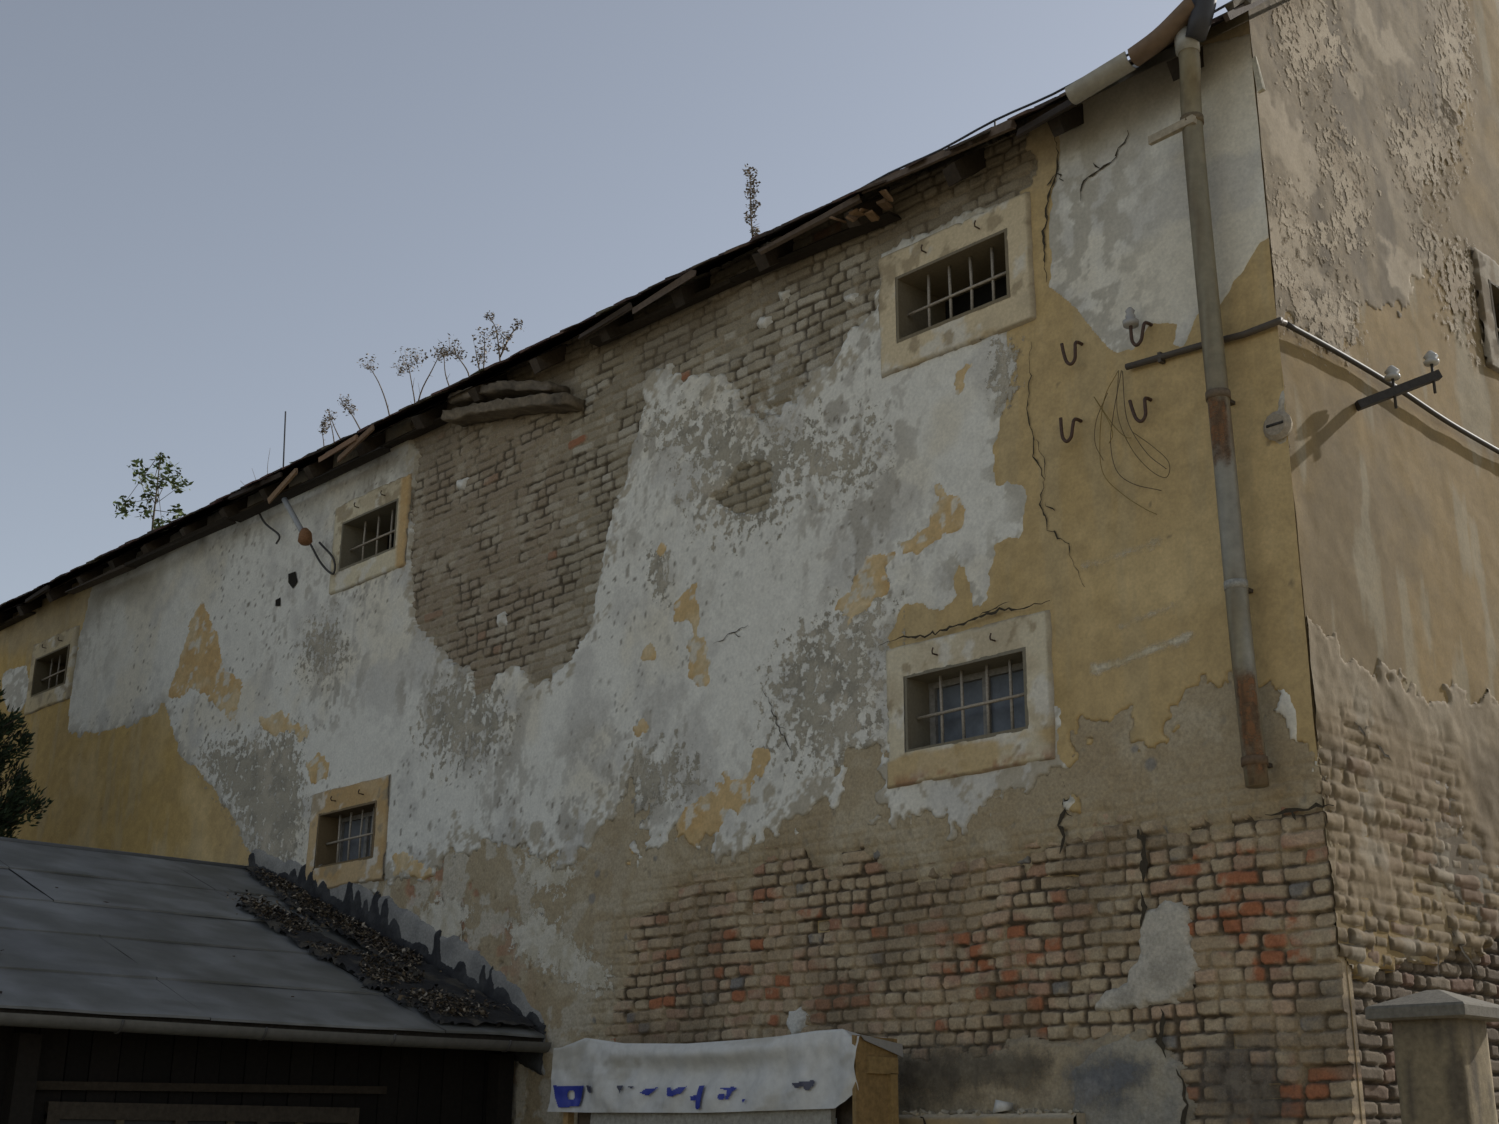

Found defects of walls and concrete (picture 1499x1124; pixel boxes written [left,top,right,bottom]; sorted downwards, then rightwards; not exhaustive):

peeling [1049,47,1199,353]
flaking render [1200,0,1485,374]
crack [1026,344,1085,587]
corrosion [1208,397,1231,460]
peeling [68,117,1324,1124]
crack [879,600,1050,646]
corrosion [1237,674,1265,782]
flaking render [1307,615,1499,966]
flaking render [605,807,1499,1124]